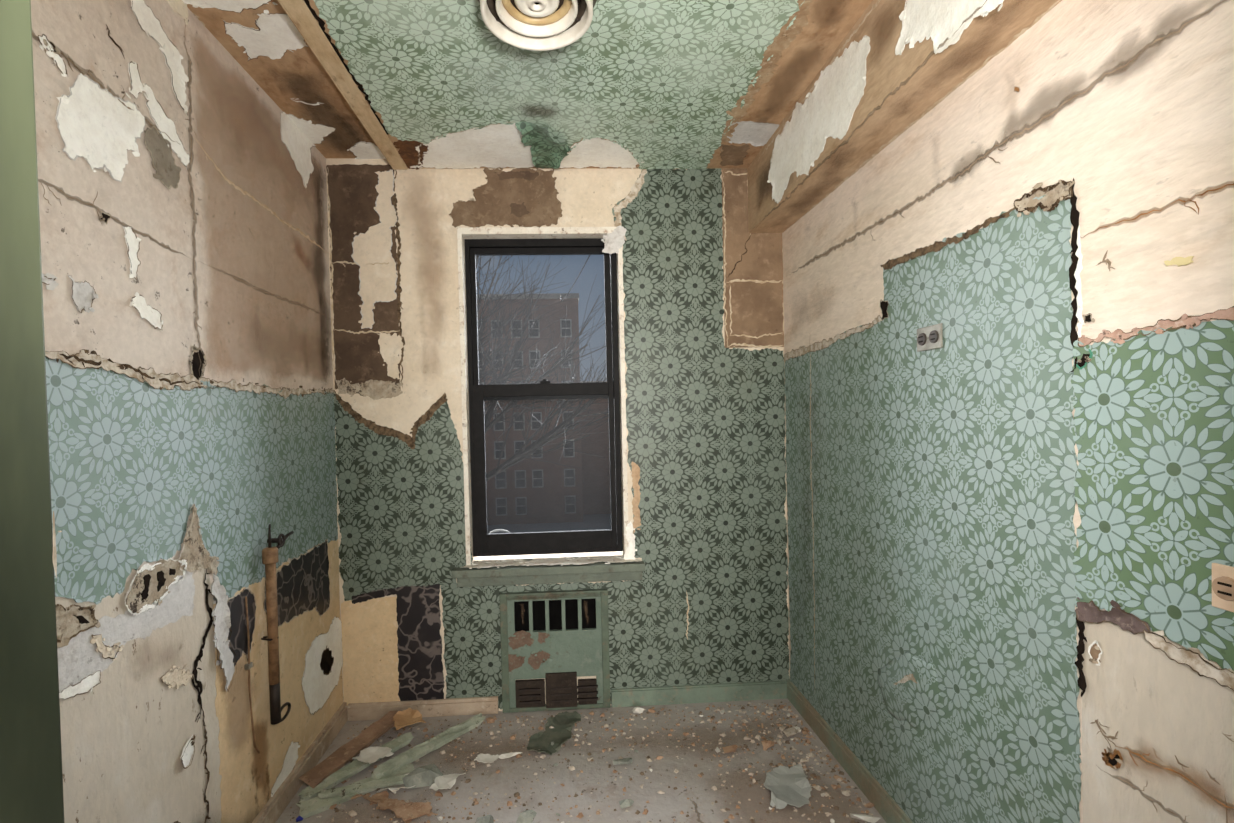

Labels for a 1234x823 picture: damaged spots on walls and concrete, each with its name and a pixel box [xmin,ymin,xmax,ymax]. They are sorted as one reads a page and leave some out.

flaking render [38,0,190,190]
flaking render [182,0,309,61]
spalling [255,111,644,400]
flaking render [719,35,871,204]
flaking render [895,0,1004,55]
crack [728,0,1227,277]
spalling [1004,179,1075,218]
crack [1069,178,1234,373]
spalling [1073,306,1234,370]
spalling [56,604,124,700]
crack [191,569,215,823]
crack [1075,617,1233,823]